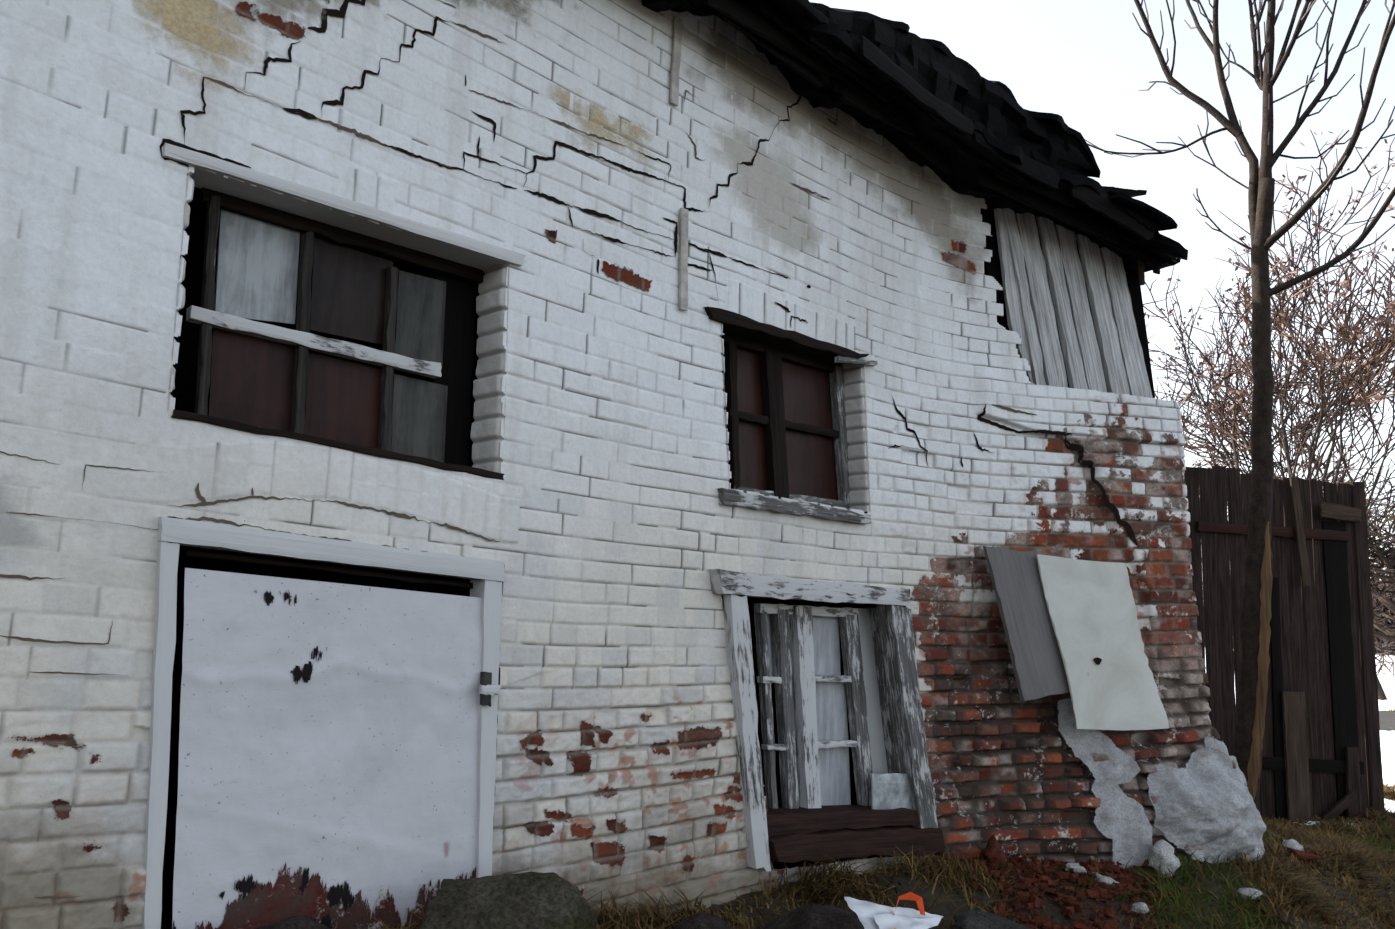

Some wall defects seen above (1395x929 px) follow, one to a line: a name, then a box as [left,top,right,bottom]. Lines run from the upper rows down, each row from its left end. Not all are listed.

peeling [235,1,306,40]
crack [160,0,811,325]
crack [792,183,830,199]
peeling [545,229,557,244]
peeling [601,261,653,292]
peeling [941,240,976,275]
crack [888,397,1139,548]
spalling [909,397,1236,869]
peeling [520,721,613,776]
peeling [651,726,743,837]
peeling [525,809,628,868]
peeling [648,835,667,853]